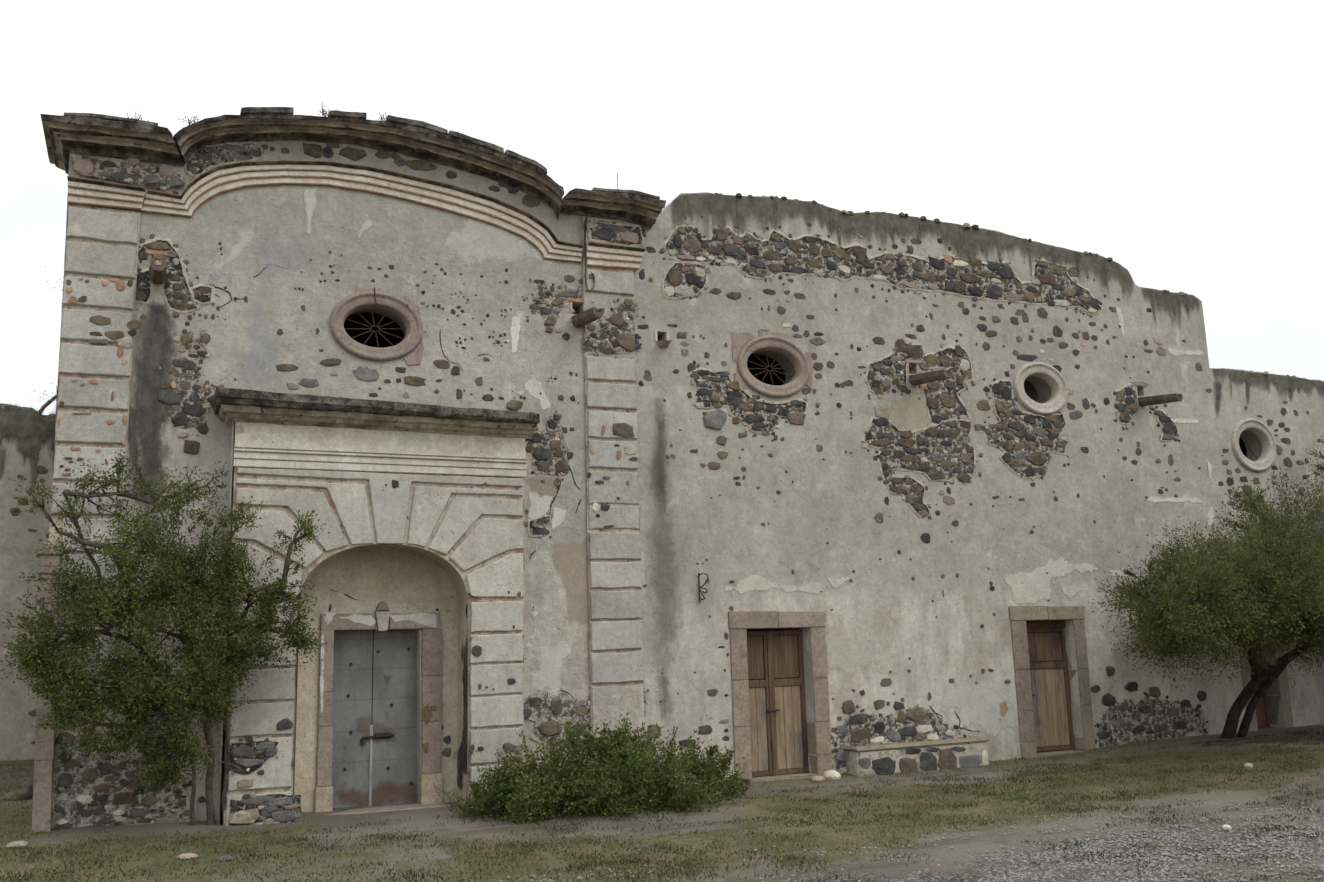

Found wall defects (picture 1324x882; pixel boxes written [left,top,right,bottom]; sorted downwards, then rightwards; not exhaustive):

leakage [0,404,56,486]
leakage [128,303,176,527]
spalling [66,234,247,455]
spalling [275,328,579,538]
spalling [416,263,649,361]
leakage [671,193,1199,322]
spalling [587,215,1318,543]
spalling [422,636,516,790]
spalling [502,687,606,754]
spalling [817,657,977,774]
rust [340,782,416,806]